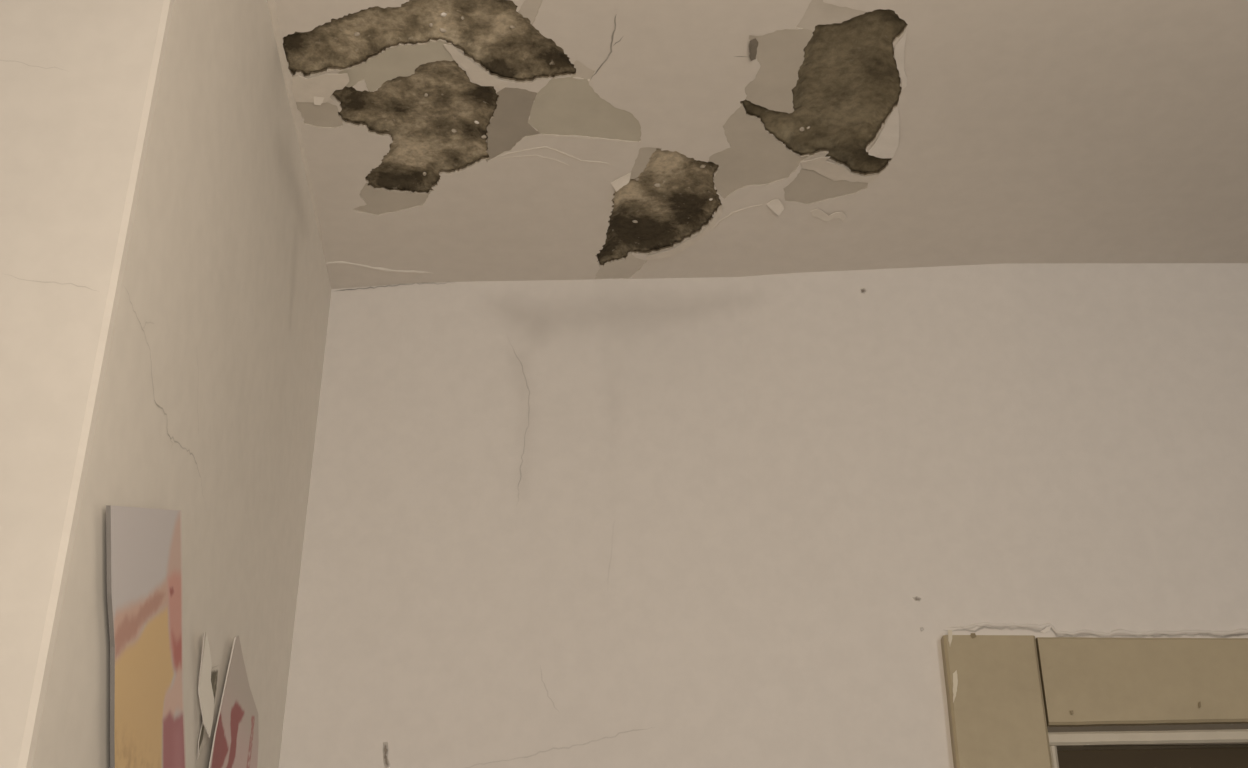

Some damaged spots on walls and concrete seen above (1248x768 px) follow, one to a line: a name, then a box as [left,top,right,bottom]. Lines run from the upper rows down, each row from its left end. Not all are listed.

flaking render [282,0,908,279]